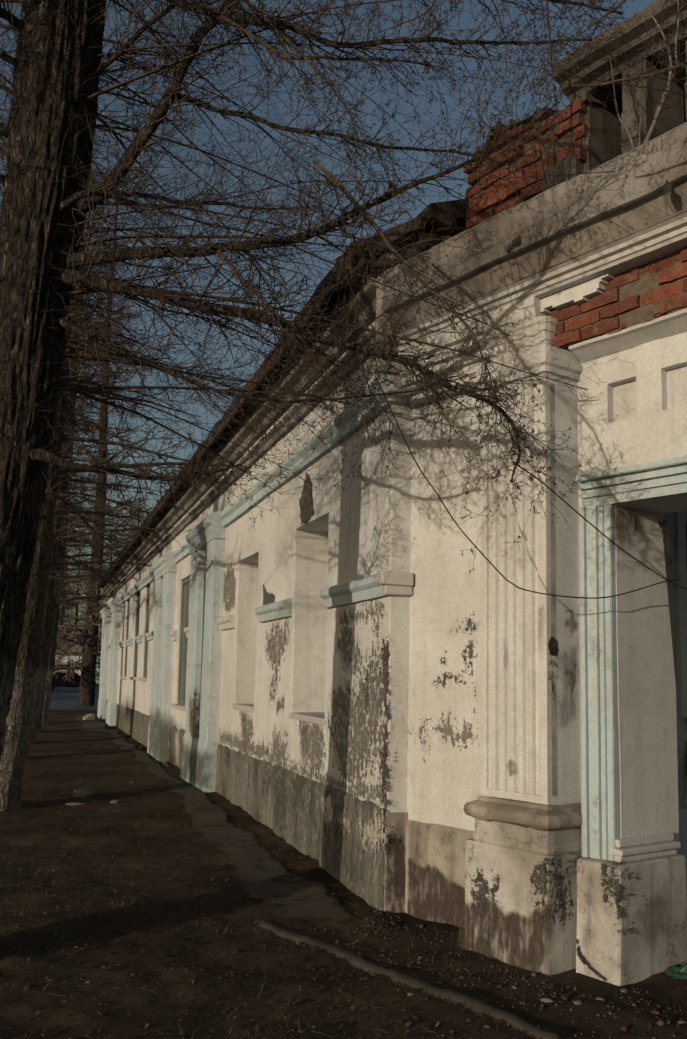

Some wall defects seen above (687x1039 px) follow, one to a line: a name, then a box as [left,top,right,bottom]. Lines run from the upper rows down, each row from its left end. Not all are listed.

flaking render [463,90,607,229]
flaking render [548,248,687,352]
flaking render [299,472,314,525]
peeling [432,614,479,697]
peeling [219,599,397,860]
peeling [410,711,479,762]
leakage [385,833,574,977]